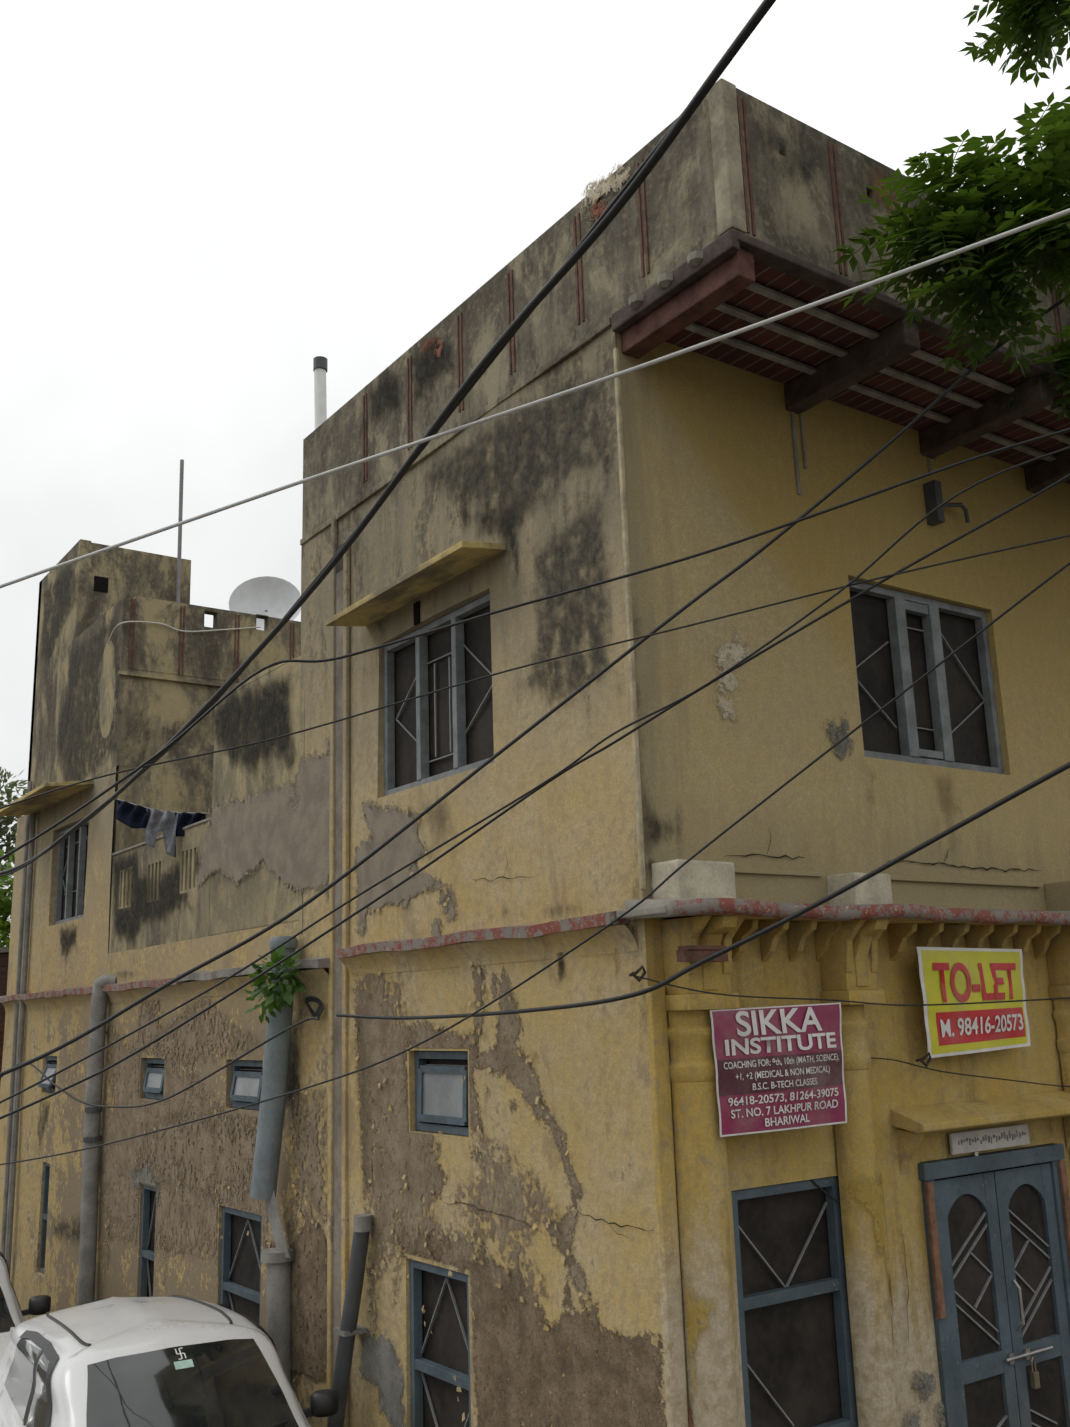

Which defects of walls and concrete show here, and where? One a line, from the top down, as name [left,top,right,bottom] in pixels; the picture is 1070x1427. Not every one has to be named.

damp [430,383,601,557]
damp [42,567,76,658]
damp [56,620,119,782]
damp [213,680,293,769]
damp [529,507,605,698]
peeling [714,627,756,730]
damp [112,855,198,941]
peeling [352,800,458,937]
peeling [349,961,668,1427]